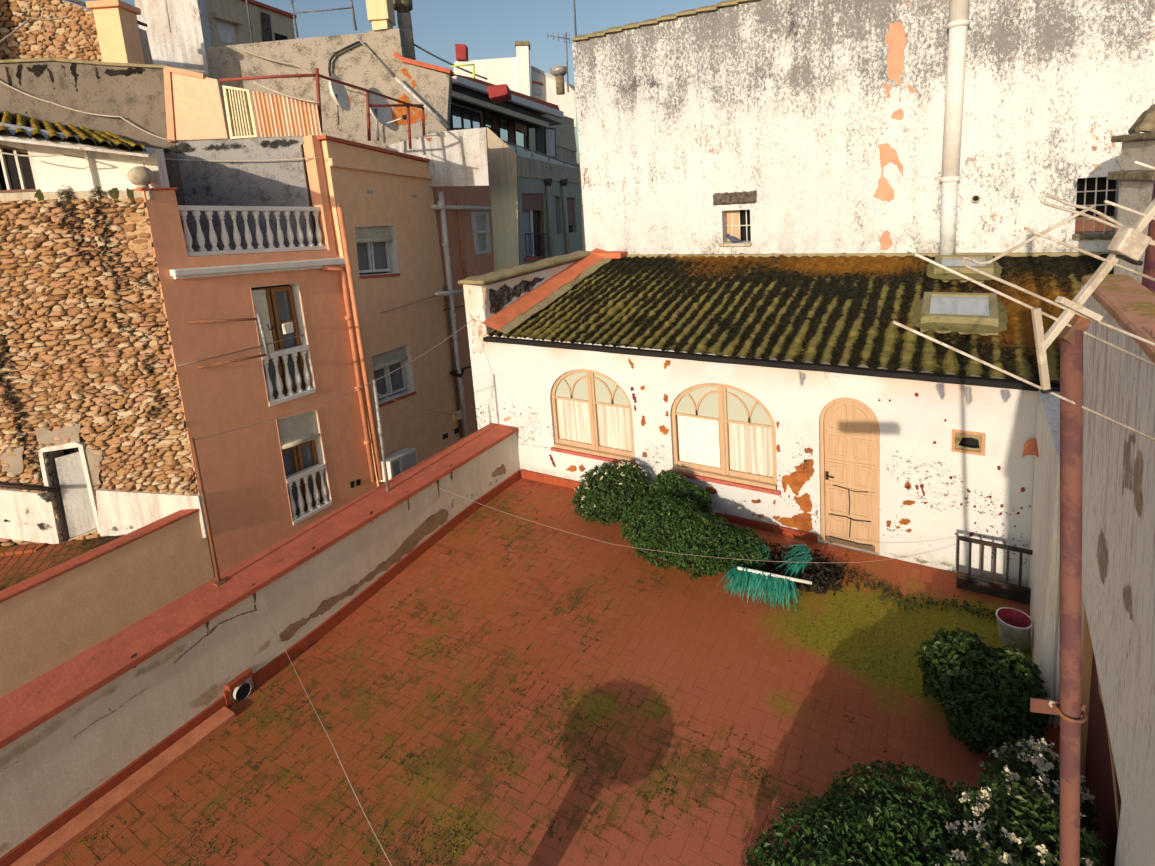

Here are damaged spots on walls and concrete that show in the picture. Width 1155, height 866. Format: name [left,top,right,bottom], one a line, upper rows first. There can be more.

leakage [5,63,79,114]
flaking render [883,21,915,120]
flaking render [864,143,904,202]
leakage [34,185,151,295]
flaking render [879,230,893,251]
leakage [469,277,544,314]
leakage [0,329,56,503]
spalling [630,386,669,465]
peeling [743,438,814,532]
leakage [259,509,448,652]
crack [174,609,257,663]
crack [74,688,147,738]